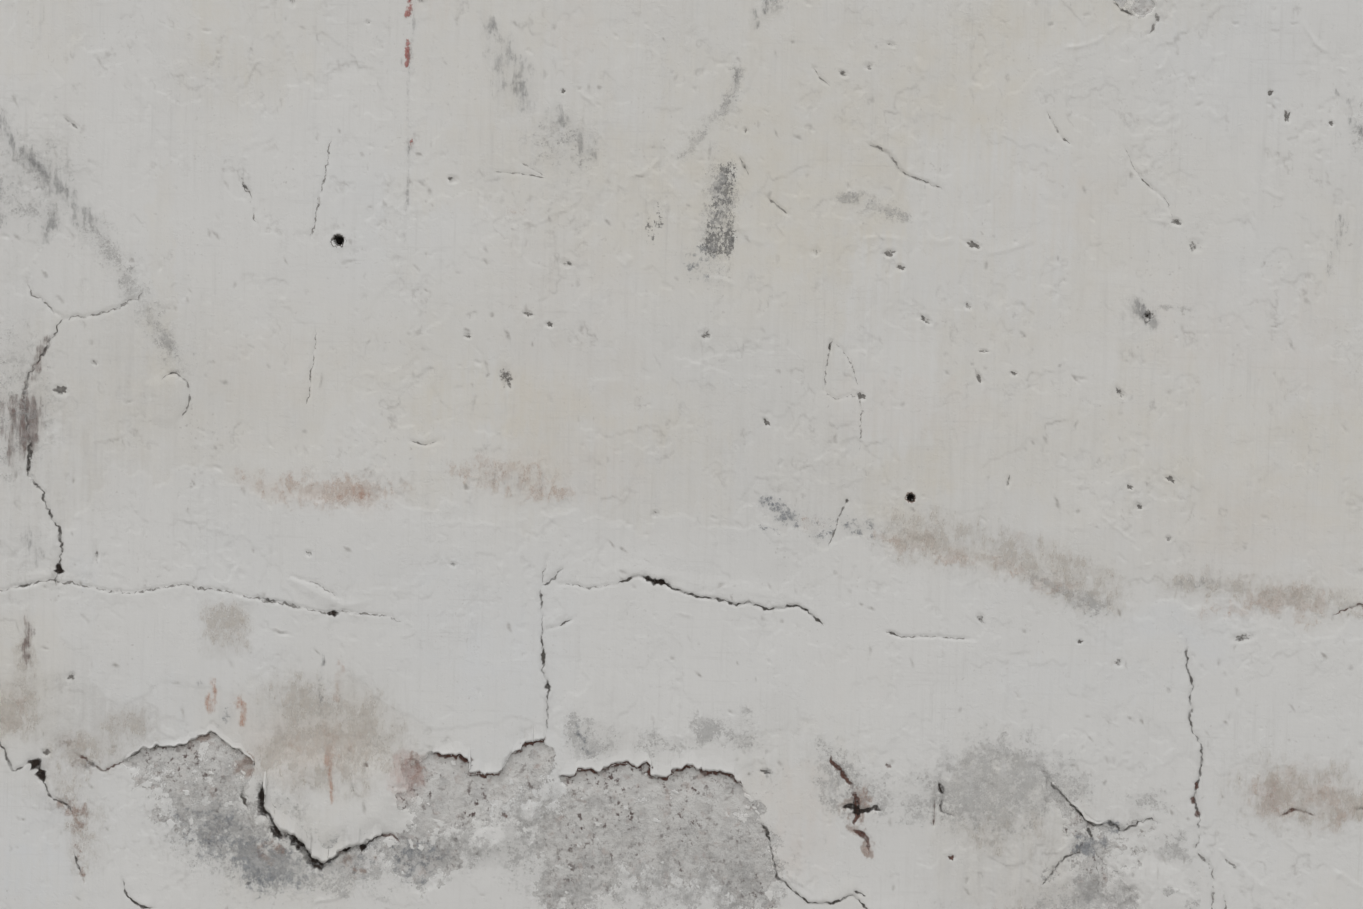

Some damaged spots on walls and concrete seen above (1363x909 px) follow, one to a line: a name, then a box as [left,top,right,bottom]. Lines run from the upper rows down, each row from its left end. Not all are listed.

crack [0,289,384,617]
crack [540,571,822,722]
crack [0,742,71,810]
spalling [122,724,786,909]
crack [830,757,881,847]
crack [1043,783,1153,892]
crack [1185,651,1234,909]